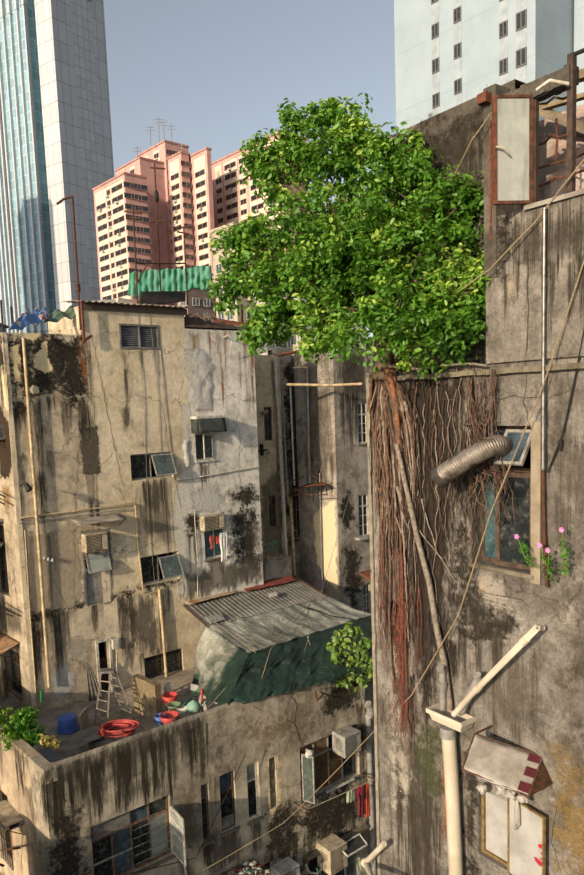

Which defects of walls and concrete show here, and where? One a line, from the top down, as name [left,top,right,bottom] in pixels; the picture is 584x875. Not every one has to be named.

damp [496,205,584,316]
damp [0,330,95,591]
damp [108,347,375,664]
damp [0,601,98,679]
damp [381,353,537,875]
damp [0,710,208,875]
damp [203,832,241,874]
damp [249,678,367,868]